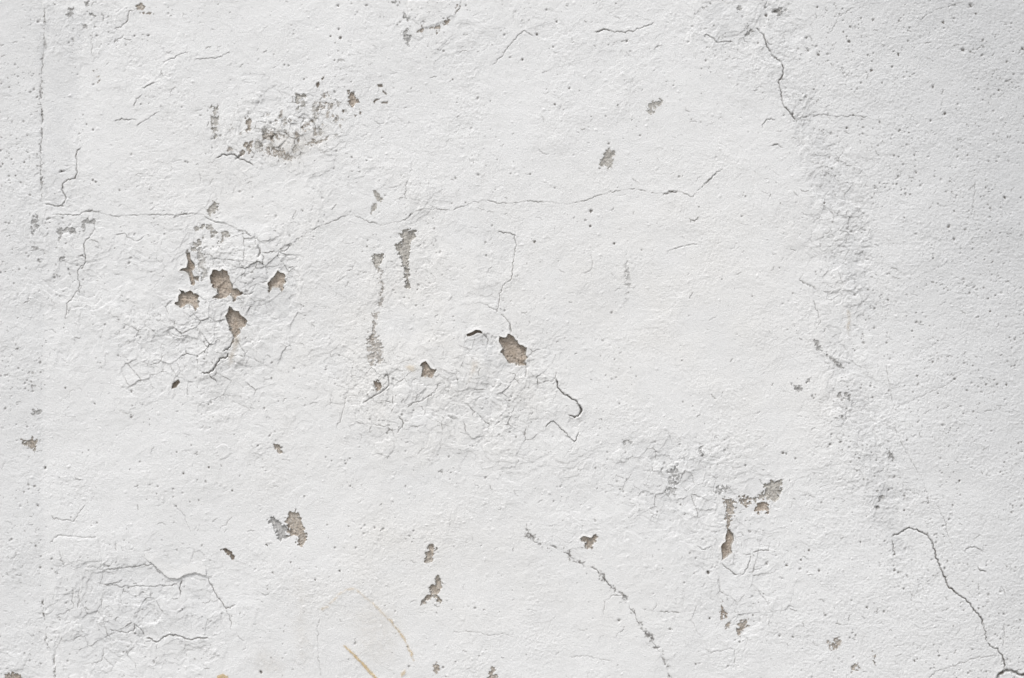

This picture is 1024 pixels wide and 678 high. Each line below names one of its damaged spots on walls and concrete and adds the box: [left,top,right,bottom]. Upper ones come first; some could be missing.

flaking render [342,90,361,117]
flaking render [173,202,249,338]
flaking render [265,268,287,292]
flaking render [395,228,417,289]
flaking render [497,332,529,365]
flaking render [418,359,436,378]
flaking render [266,511,308,547]
flaking render [424,544,438,563]
flaking render [577,534,598,549]
flaking render [719,479,783,560]
flaking render [421,575,442,605]
crack [892,529,1024,676]